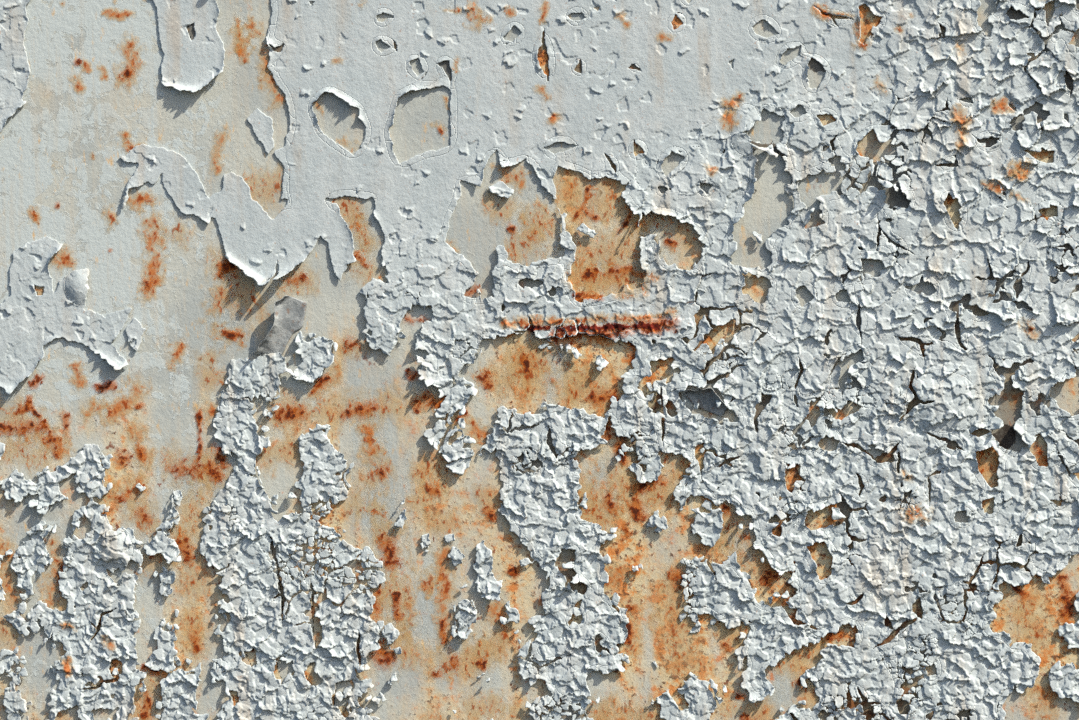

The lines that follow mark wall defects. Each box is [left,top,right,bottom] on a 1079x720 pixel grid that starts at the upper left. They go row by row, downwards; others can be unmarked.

crack [1059,69,1079,97]
corrosion [0,374,72,469]
corrosion [103,403,231,596]
peeling [0,0,861,720]
corrosion [475,308,690,538]
corrosion [482,177,701,301]
peeling [681,100,915,361]
peeling [778,344,879,584]
crack [826,301,989,519]
crack [988,261,1033,307]
peeling [949,319,1079,720]
crack [844,549,997,720]